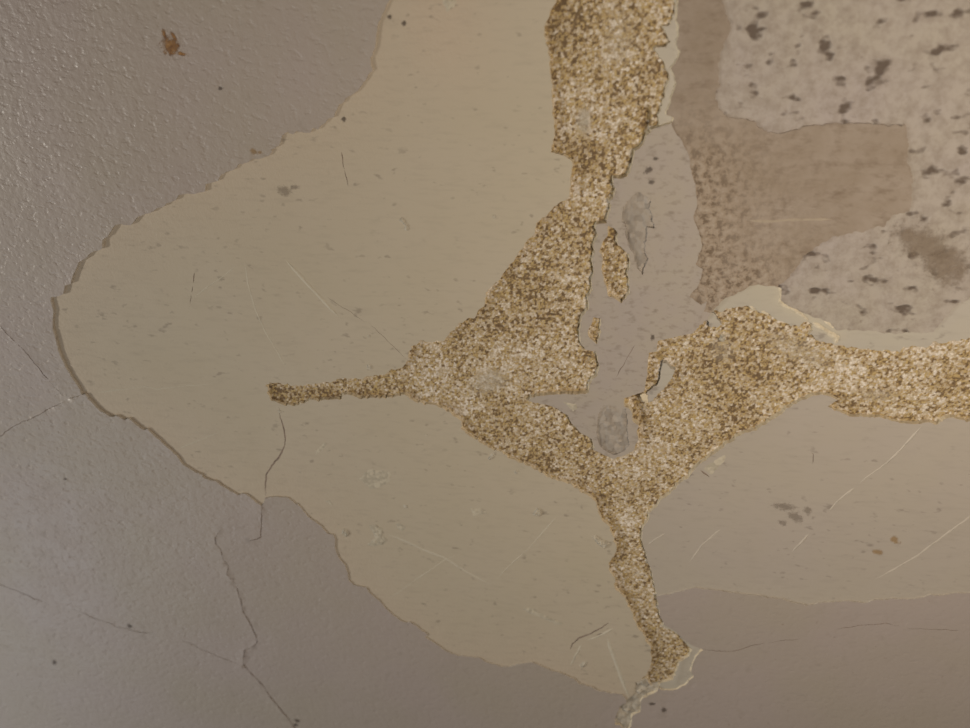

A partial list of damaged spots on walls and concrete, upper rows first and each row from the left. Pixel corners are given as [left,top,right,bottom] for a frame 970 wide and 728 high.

rust [162,29,185,56]
crack [187,533,295,728]
peeling [51,0,652,699]
spalling [265,0,970,728]